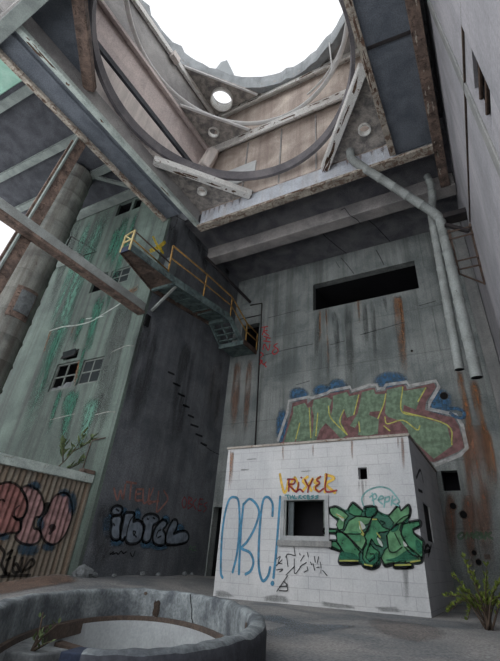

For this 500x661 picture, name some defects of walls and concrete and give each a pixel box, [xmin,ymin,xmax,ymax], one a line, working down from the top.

damp [106,216,137,275]
damp [34,266,84,403]
damp [75,300,103,375]
damp [50,392,78,434]
rust [232,364,250,417]
rust [458,373,496,553]